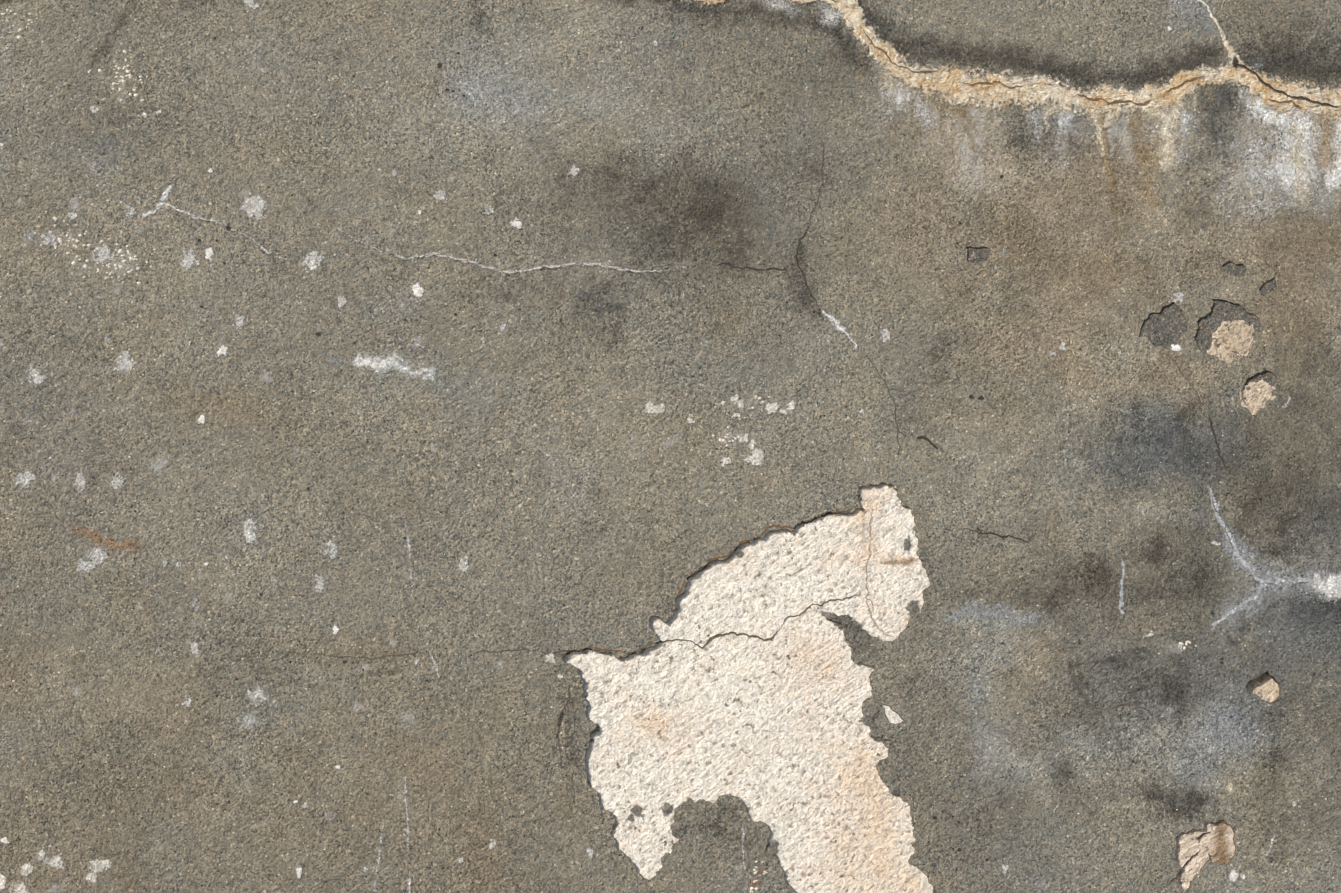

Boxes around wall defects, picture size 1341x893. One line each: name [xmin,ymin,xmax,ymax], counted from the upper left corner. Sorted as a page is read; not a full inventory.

water stain [879,70,992,152]
water stain [857,0,1219,90]
crack [792,0,1341,123]
water stain [1031,89,1196,228]
water stain [1210,85,1341,219]
crack [337,228,686,275]
crack [718,138,938,457]
peeling [1139,299,1264,363]
peeling [1239,370,1278,415]
crack [1165,353,1341,626]
flaking render [545,482,934,893]
spalling [1169,820,1245,891]